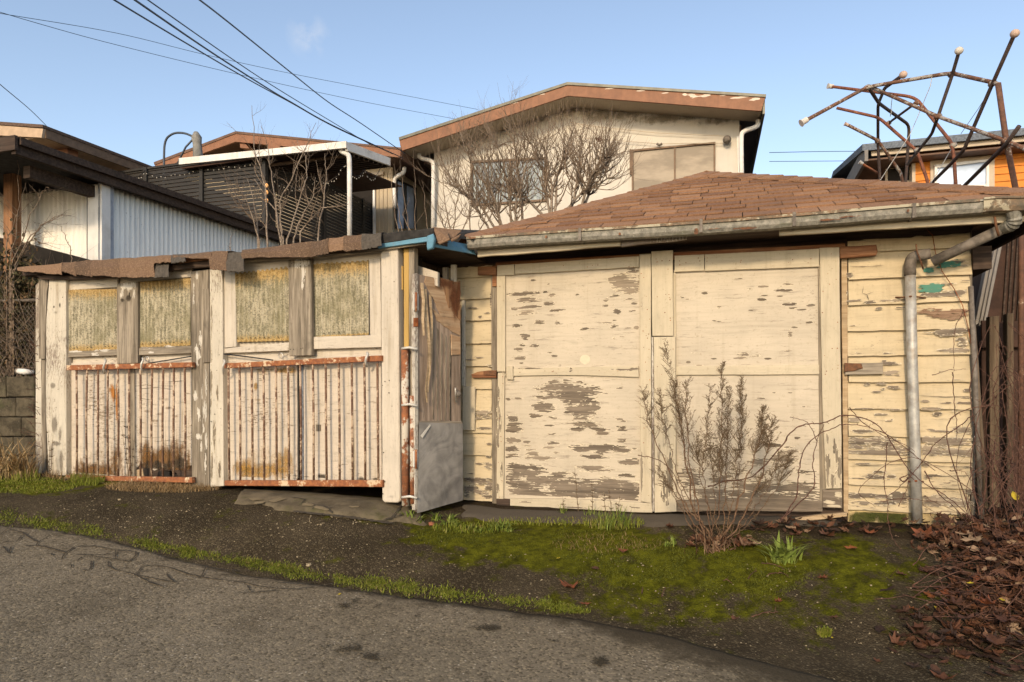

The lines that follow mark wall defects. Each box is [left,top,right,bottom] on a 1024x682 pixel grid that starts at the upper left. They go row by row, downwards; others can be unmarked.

peeling [506,279,566,369]
peeling [579,268,639,339]
peeling [847,259,970,353]
peeling [464,367,643,509]